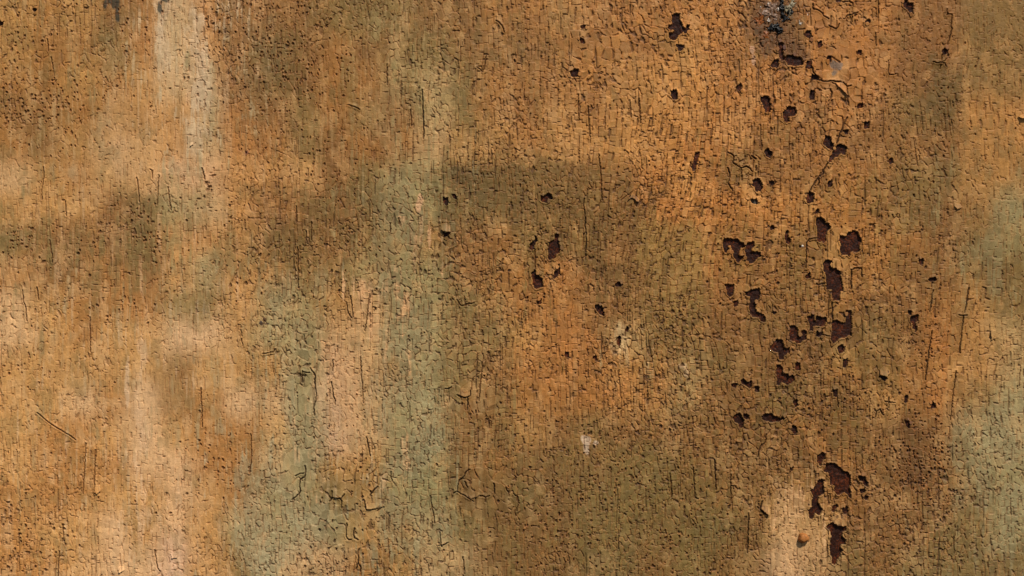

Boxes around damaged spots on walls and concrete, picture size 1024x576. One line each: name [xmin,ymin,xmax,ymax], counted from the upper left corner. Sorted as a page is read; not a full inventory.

peeling [666,11,692,53]
peeling [769,31,831,101]
peeling [759,93,799,125]
crack [809,68,848,192]
peeling [821,130,850,164]
peeling [527,231,564,304]
peeling [721,234,764,265]
peeling [723,283,776,324]
peeling [731,190,864,392]
crack [330,478,392,571]
crack [430,470,518,571]
peeling [807,450,870,567]